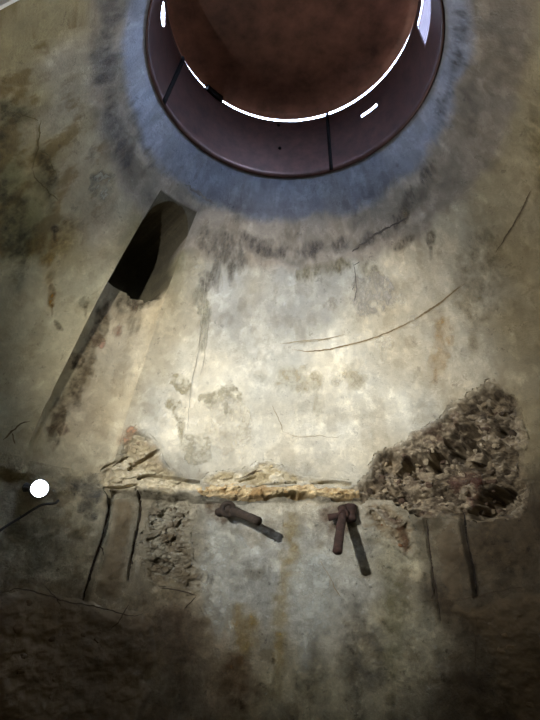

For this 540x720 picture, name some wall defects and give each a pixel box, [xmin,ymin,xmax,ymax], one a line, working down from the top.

water stain [195,230,245,315]
water stain [353,264,394,316]
crack [352,218,407,304]
water stain [47,296,157,446]
spalling [97,378,530,595]